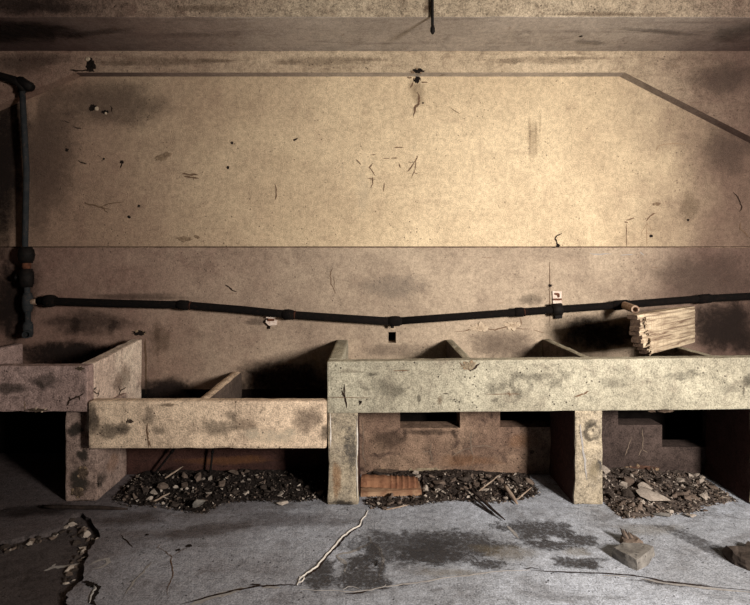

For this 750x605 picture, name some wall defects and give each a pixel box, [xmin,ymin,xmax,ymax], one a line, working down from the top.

crack [158,511,750,605]
damp [305,520,607,590]